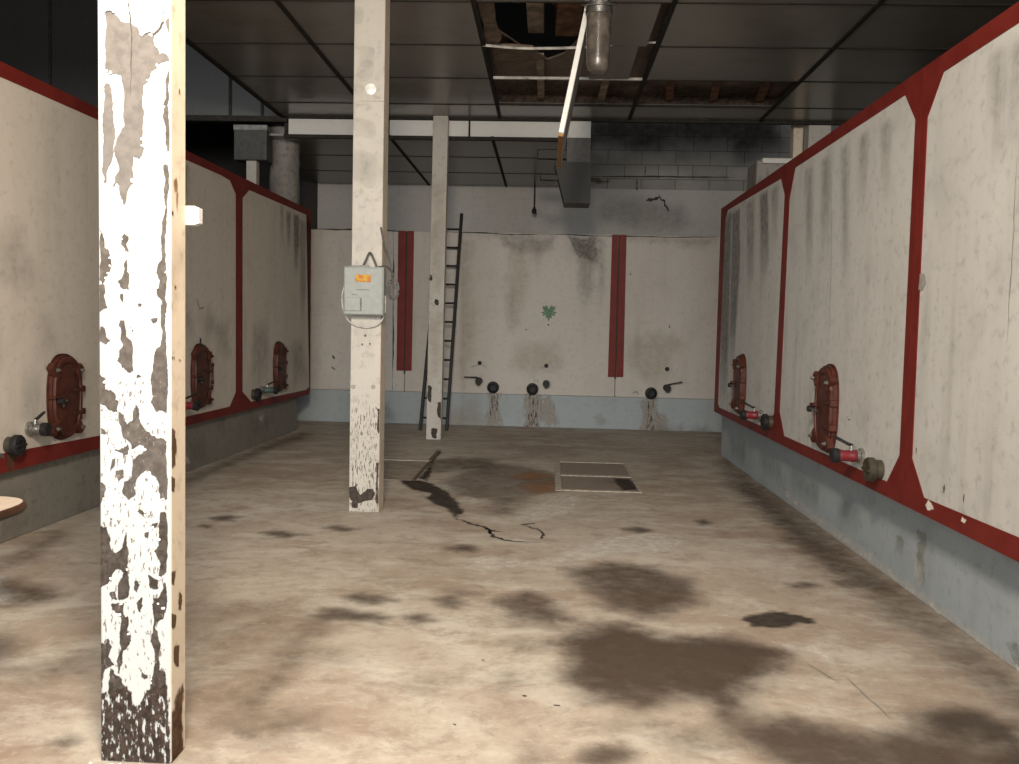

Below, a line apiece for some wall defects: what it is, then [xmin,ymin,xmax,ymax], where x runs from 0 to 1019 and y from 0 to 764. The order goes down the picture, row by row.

peeling [102,12,180,204]
peeling [89,164,184,764]
peeling [349,408,380,512]
crack [455,517,545,543]
damp [456,528,689,614]
damp [561,625,777,706]